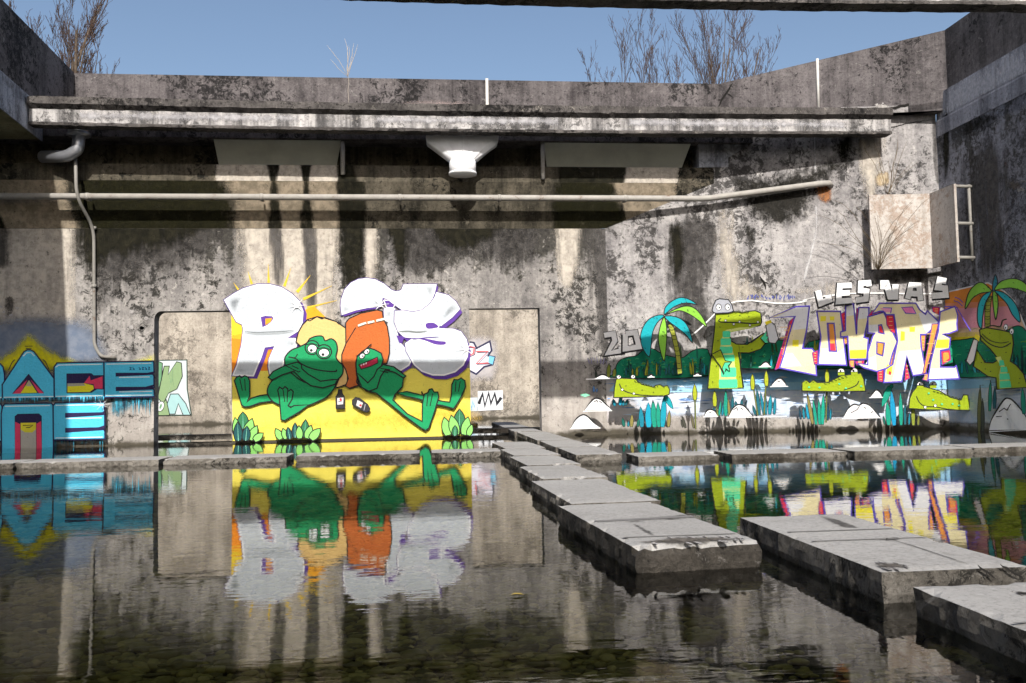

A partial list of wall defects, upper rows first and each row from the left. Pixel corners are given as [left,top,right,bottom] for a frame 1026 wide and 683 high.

water stain [0,180,222,324]
water stain [216,164,539,320]
water stain [555,229,608,358]
water stain [609,167,679,220]
water stain [668,215,754,342]
water stain [630,119,889,195]
water stain [933,110,949,183]
water stain [964,143,1008,274]
crack [886,538,1023,579]